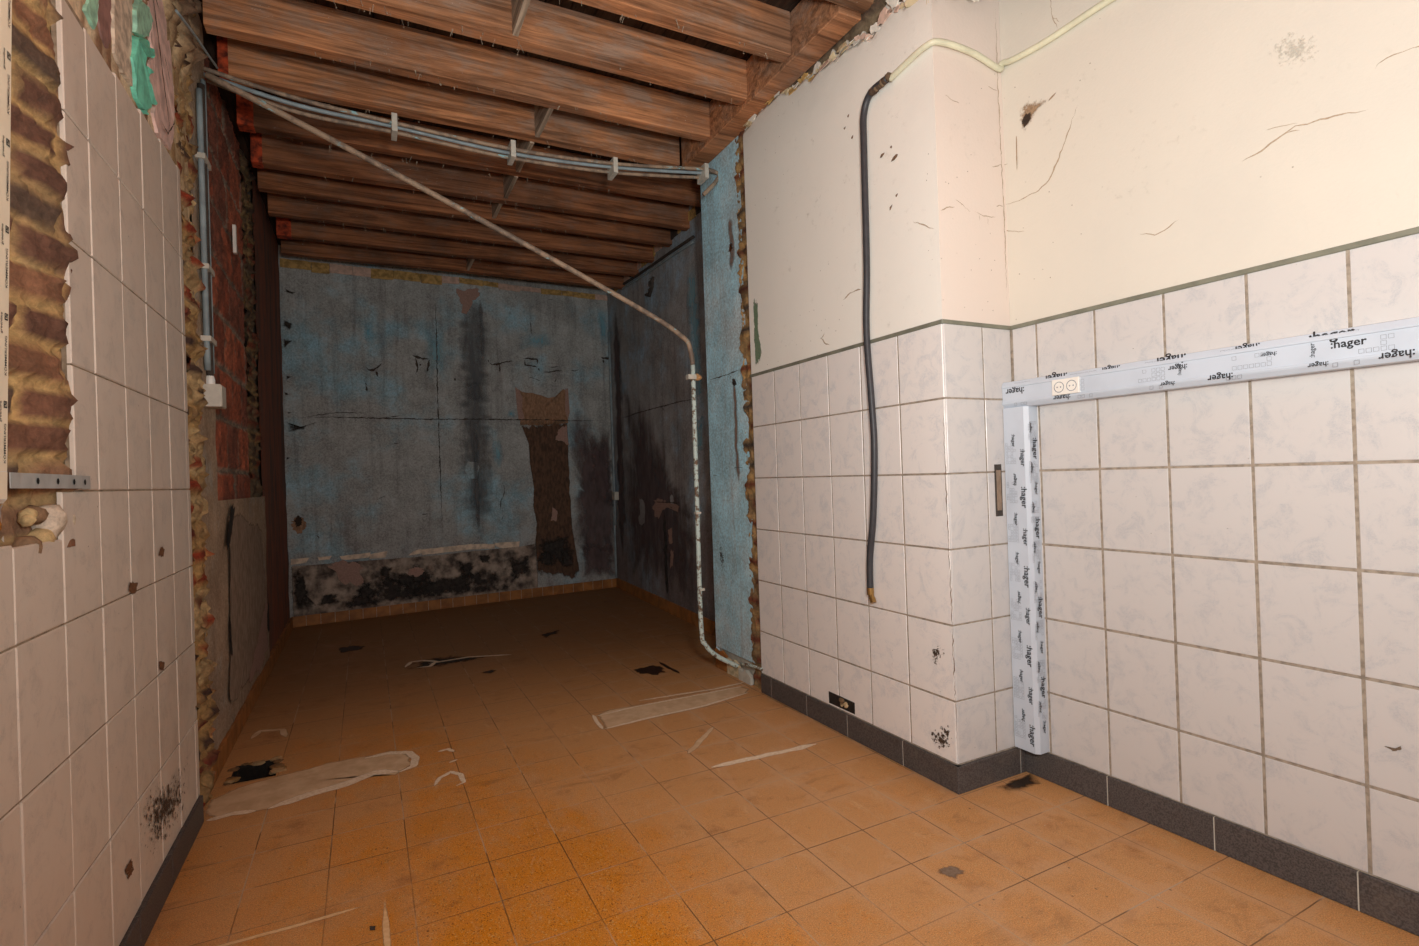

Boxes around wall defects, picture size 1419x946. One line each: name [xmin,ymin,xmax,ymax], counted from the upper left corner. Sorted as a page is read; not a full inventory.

peeling [82,0,175,150]
flaking render [743,0,929,130]
spalling [1016,94,1055,163]
crack [1243,111,1361,161]
flaking render [0,0,79,547]
flaking render [239,148,264,497]
flaking render [279,206,701,314]
damp [292,305,693,617]
flaking render [408,387,579,579]